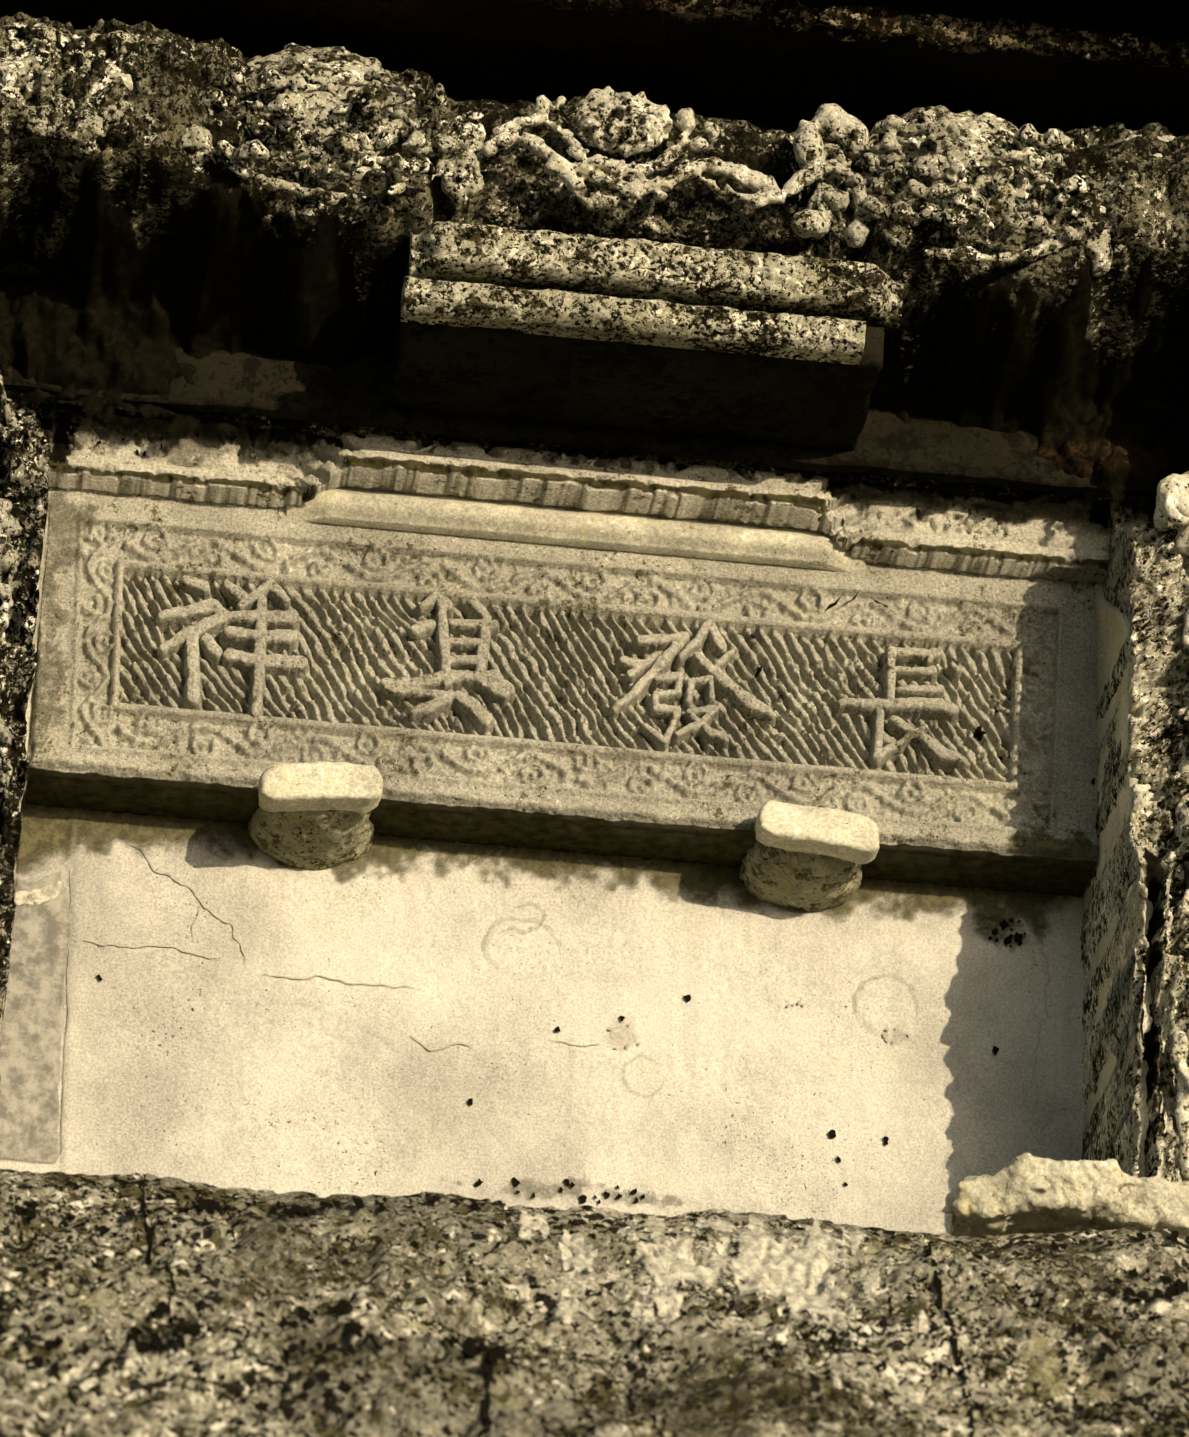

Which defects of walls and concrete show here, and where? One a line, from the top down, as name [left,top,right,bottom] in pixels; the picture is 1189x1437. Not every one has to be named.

crack [463,1340,494,1437]
crack [919,1244,988,1437]